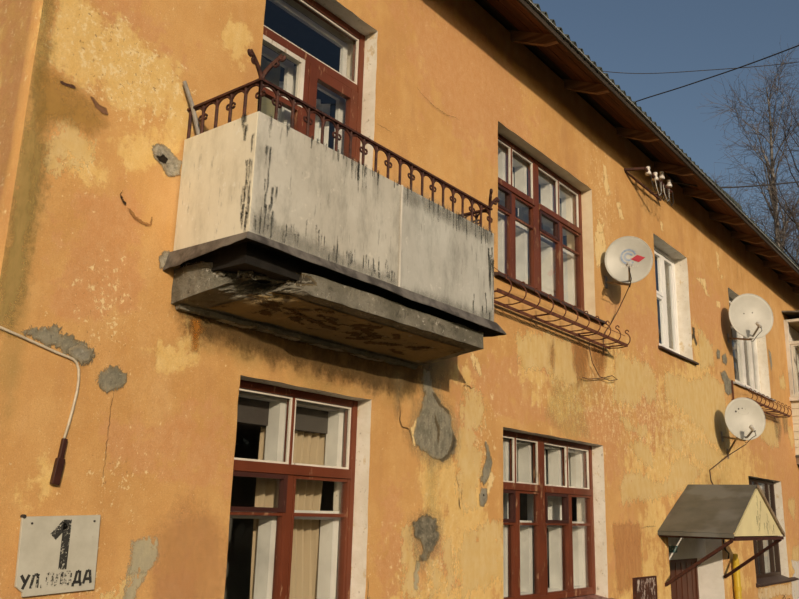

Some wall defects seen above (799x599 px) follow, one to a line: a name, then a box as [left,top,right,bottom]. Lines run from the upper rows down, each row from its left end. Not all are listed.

spalling [152,144,182,177]
damp [240,114,278,237]
damp [337,149,379,191]
damp [185,312,421,395]
peeling [242,294,434,355]
peeling [411,369,495,513]
peeling [100,536,159,599]
spalling [413,514,439,562]